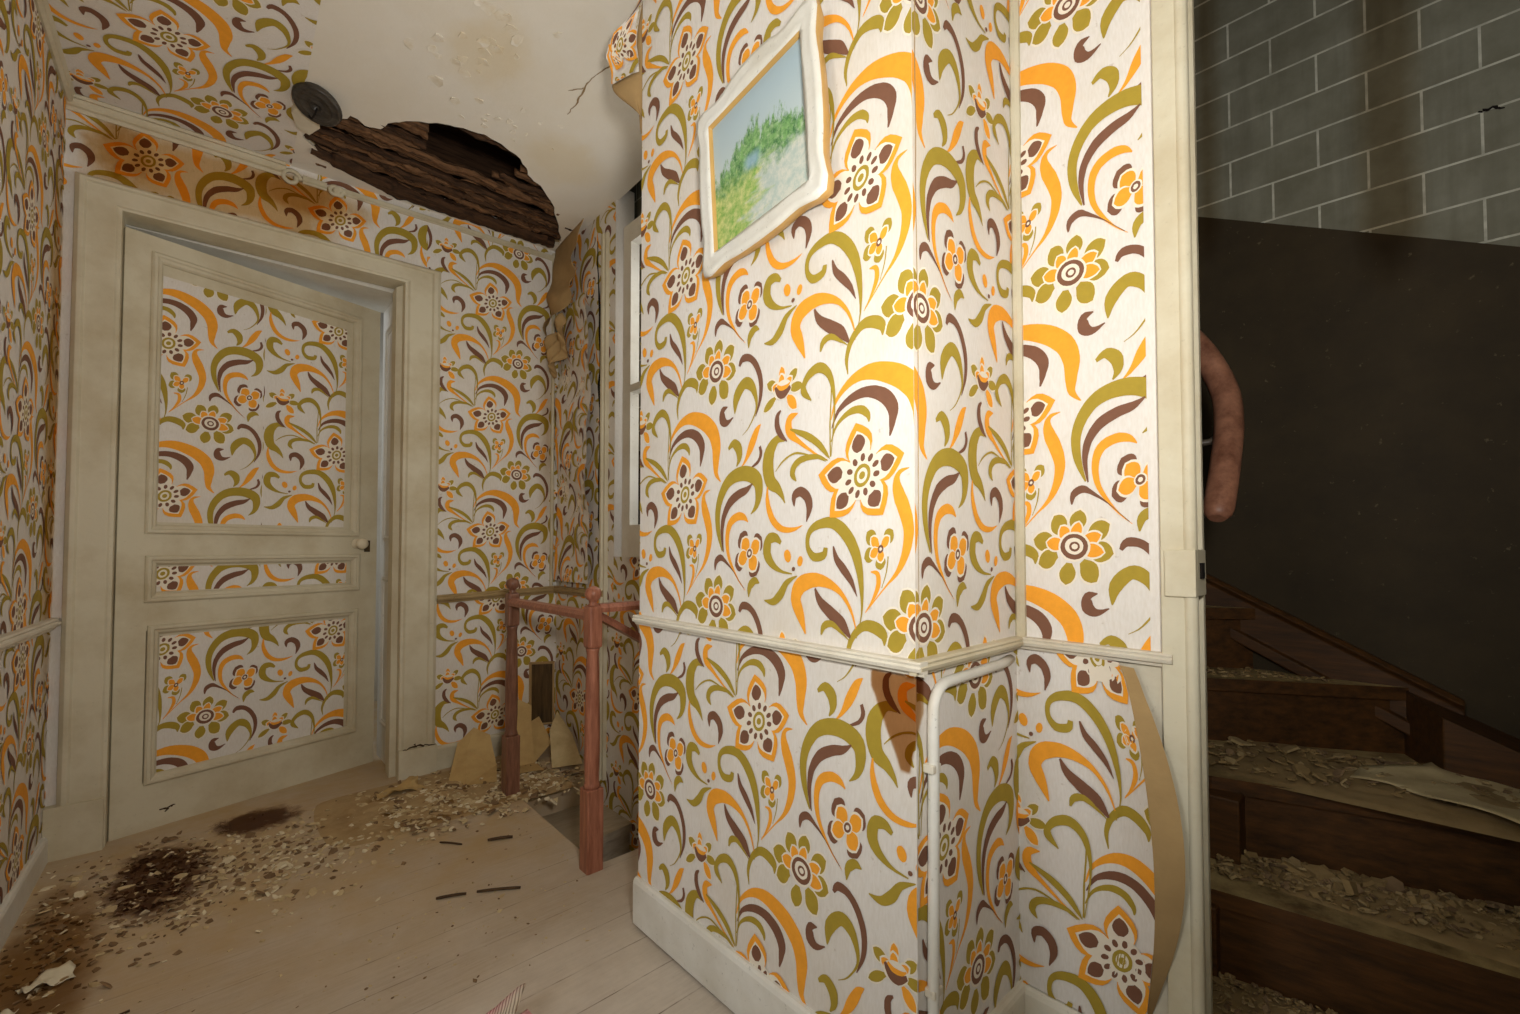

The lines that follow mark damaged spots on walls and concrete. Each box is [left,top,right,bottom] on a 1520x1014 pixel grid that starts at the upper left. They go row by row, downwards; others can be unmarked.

spalling [333,121,561,245]
flaking render [1111,660,1164,748]
flaking render [1153,975,1168,1014]